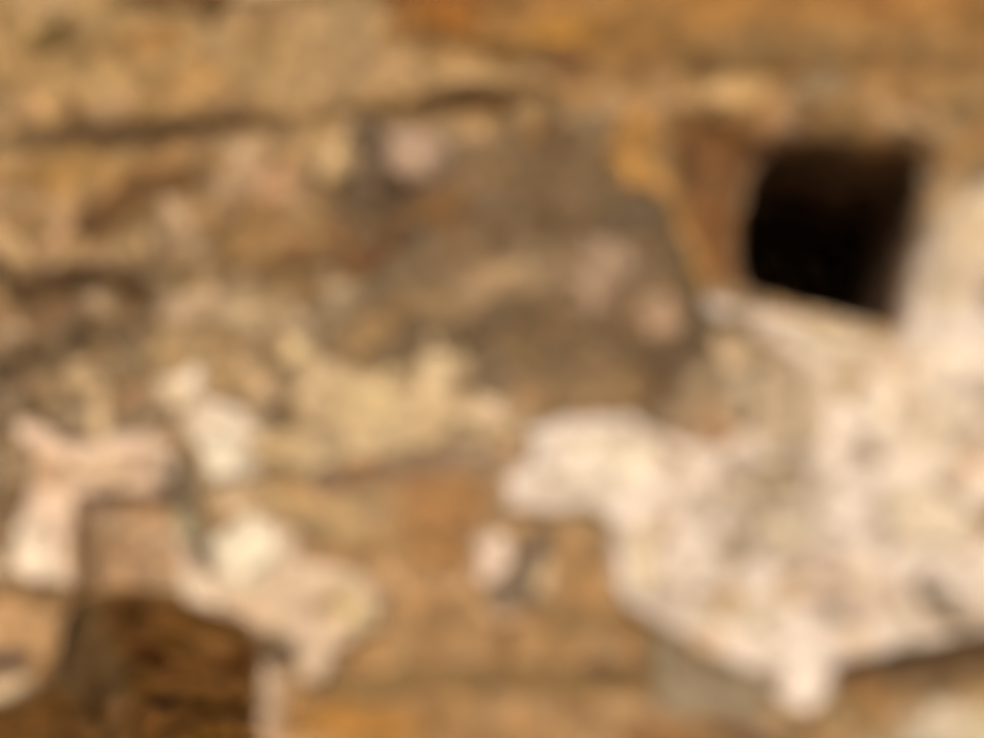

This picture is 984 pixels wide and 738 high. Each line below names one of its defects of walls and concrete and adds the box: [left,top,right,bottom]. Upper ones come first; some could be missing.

spalling [319,132,349,184]
spalling [0,221,37,269]
peeling [154,183,984,711]
peeling [13,363,177,589]
spalling [0,678,38,704]